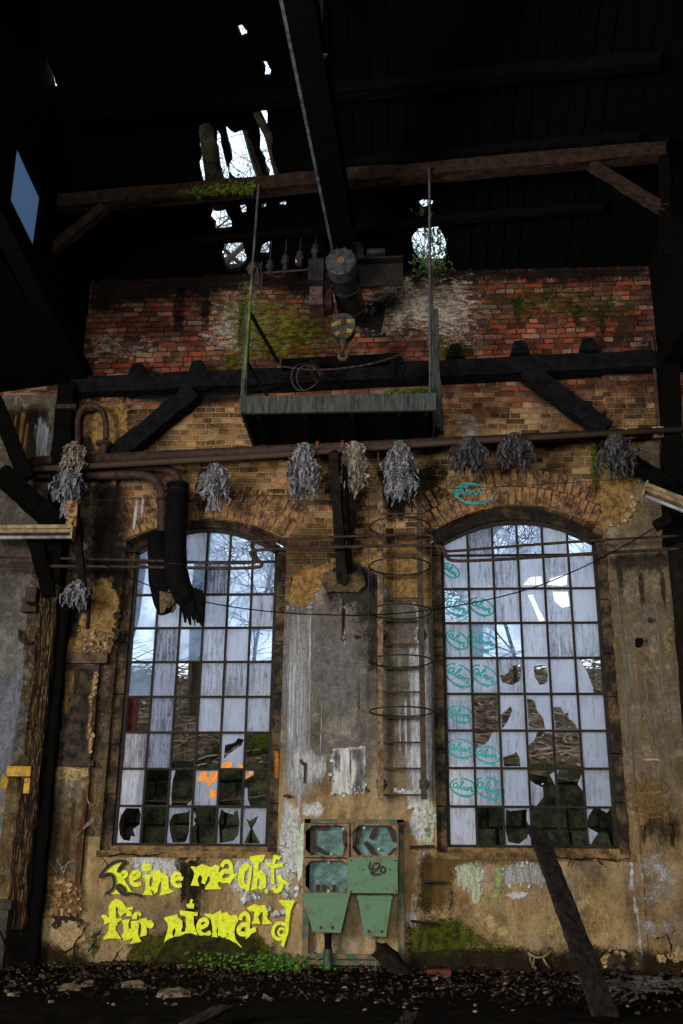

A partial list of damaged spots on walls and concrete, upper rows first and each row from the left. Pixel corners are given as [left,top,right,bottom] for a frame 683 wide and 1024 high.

leakage [357,271,489,347]
flaking render [54,576,121,781]
peeling [227,562,368,917]
efflorescence [284,749,327,832]
peeling [455,860,546,904]